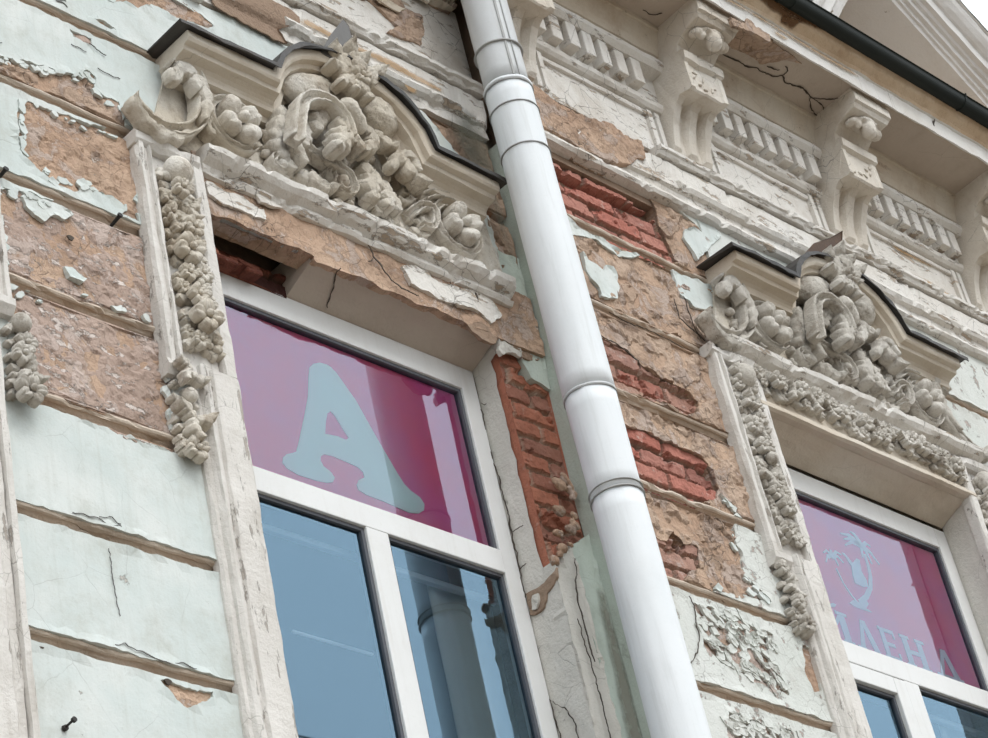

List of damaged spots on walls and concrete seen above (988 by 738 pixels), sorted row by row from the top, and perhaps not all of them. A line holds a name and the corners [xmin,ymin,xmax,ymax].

spalling [108,0,300,44]
flaking render [361,0,430,46]
crack [722,54,838,116]
peeling [0,56,141,223]
peeling [0,186,177,435]
flaking render [400,264,583,616]
peeling [533,84,789,696]
crack [72,512,122,616]
crack [115,643,197,669]
crack [574,558,611,738]
crack [549,699,579,738]
peeling [719,711,798,738]